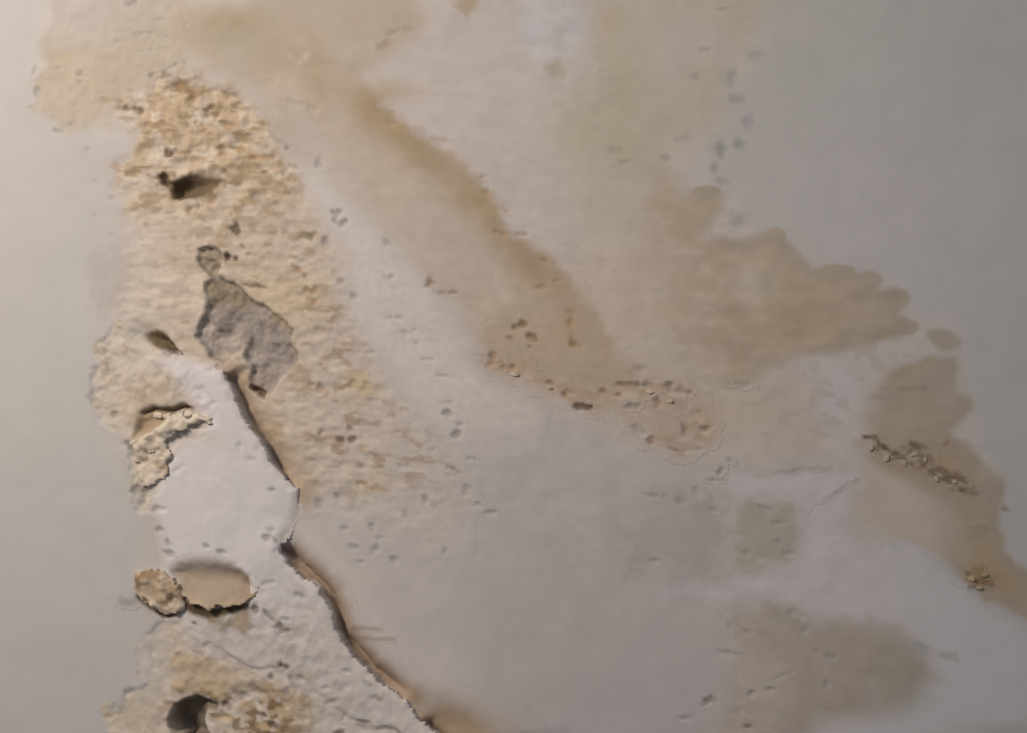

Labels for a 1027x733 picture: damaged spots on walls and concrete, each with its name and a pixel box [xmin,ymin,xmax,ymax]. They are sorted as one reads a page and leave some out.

spalling [80,58,554,733]
water stain [18,0,641,381]
water stain [523,0,1027,624]
water stain [599,473,972,733]